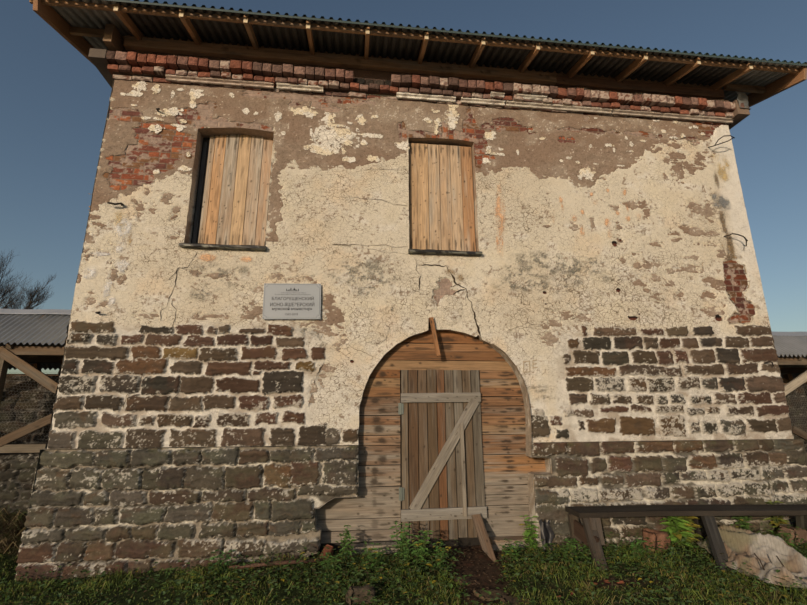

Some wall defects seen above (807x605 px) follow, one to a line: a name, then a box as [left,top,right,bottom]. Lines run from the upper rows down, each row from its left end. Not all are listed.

peeling [83,78,719,285]
peeling [85,291,111,308]
crack [160,253,197,326]
peeling [240,287,264,320]
crack [332,244,482,340]
spalling [619,199,755,324]